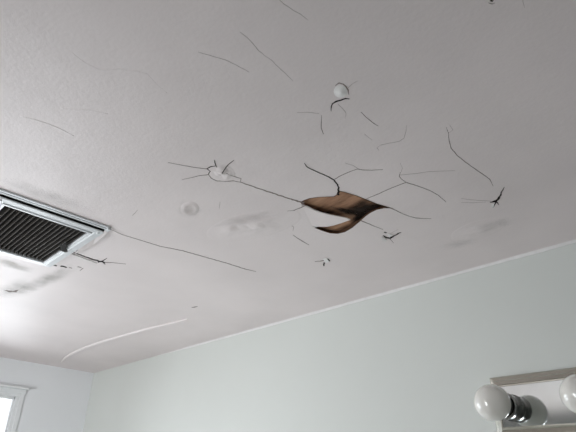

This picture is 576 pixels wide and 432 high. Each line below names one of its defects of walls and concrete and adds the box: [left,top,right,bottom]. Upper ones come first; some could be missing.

crack [447,126,492,183]
crack [168,160,306,211]
crack [304,163,383,195]
crack [367,168,446,202]
crack [72,252,123,264]
crack [113,230,256,272]